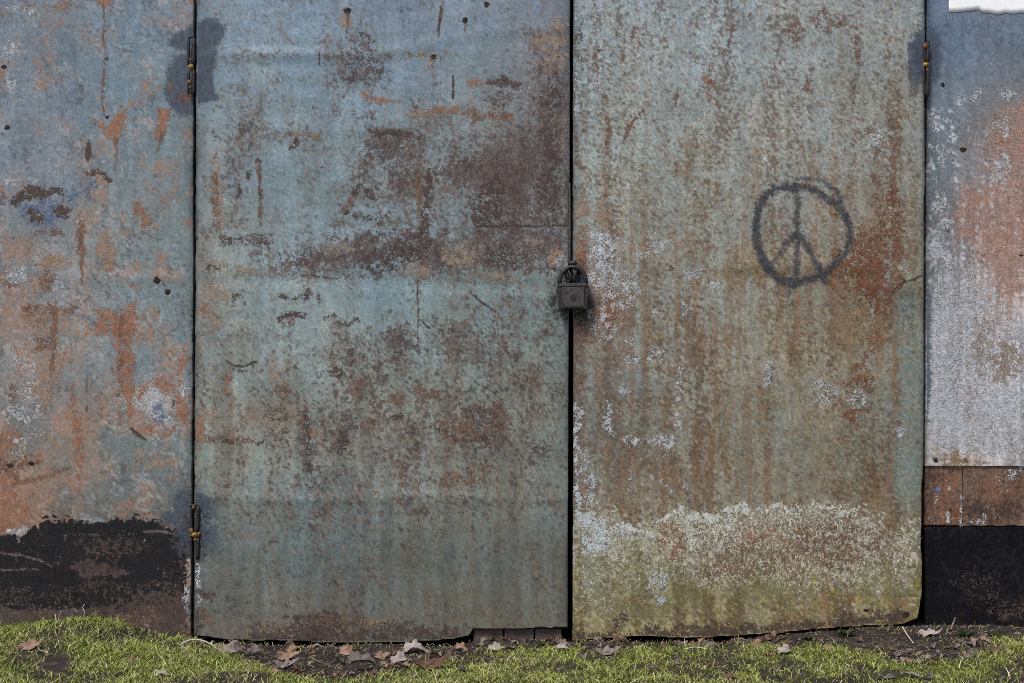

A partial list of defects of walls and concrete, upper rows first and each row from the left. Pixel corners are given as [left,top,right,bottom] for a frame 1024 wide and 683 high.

corrosion [91,0,162,168]
corrosion [702,65,715,100]
corrosion [605,109,645,148]
corrosion [196,16,582,331]
corrosion [827,72,914,433]
corrosion [0,108,188,536]
corrosion [92,301,448,494]
corrosion [433,403,512,444]
corrosion [439,464,494,489]
water stain [622,571,669,614]
water stain [850,555,915,610]